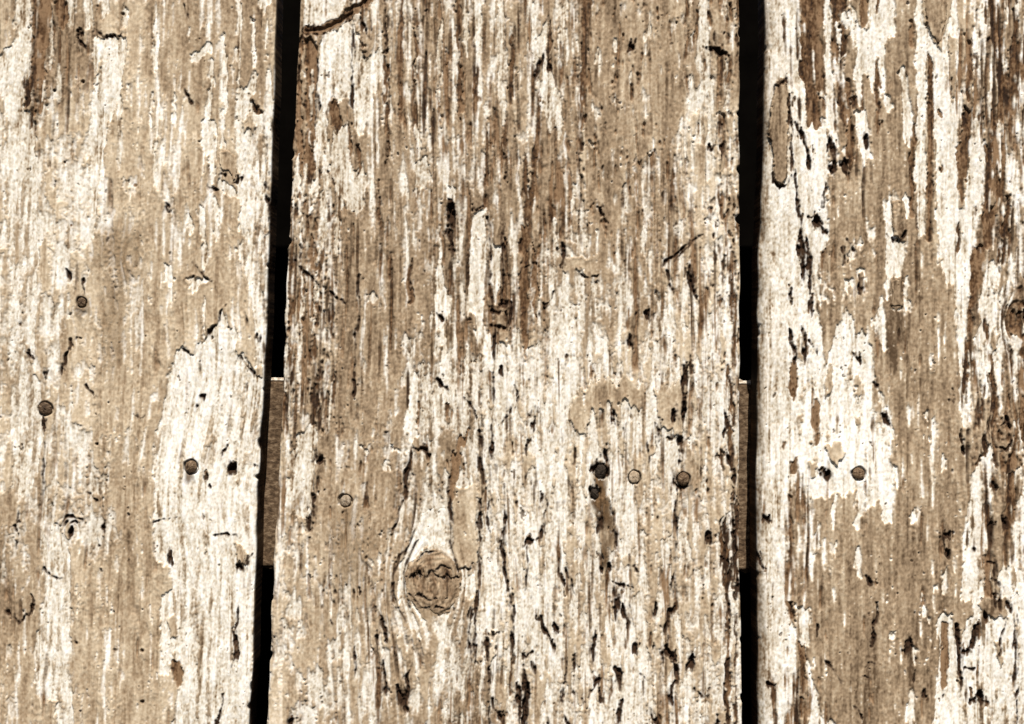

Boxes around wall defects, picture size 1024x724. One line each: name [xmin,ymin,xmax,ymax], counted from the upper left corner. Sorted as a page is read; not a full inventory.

peeling [83,0,129,238]
peeling [292,0,383,257]
peeling [462,0,483,57]
peeling [524,0,568,140]
peeling [683,0,730,159]
peeling [0,0,44,496]
peeling [151,0,272,724]
peeling [285,270,320,384]
peeling [284,382,332,518]
peeling [382,208,741,724]
peeling [757,0,1024,724]
peeling [32,523,75,724]